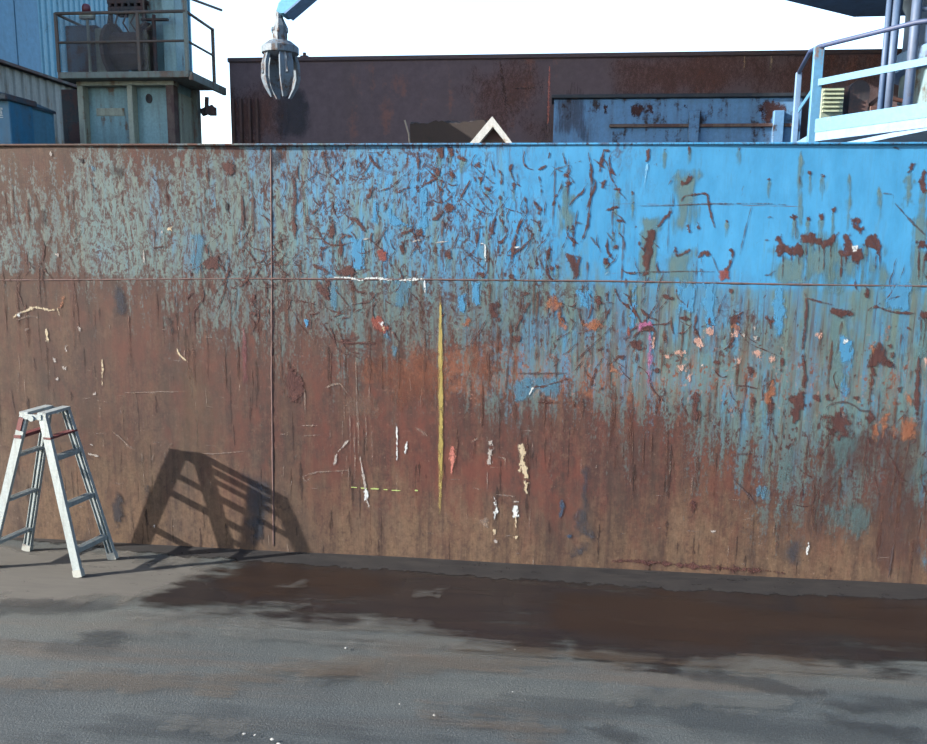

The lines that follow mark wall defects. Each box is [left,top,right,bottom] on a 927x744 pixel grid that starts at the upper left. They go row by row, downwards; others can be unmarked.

rust [241,177,254,236]
rust [291,175,310,239]
rust [312,219,363,309]
rust [432,203,454,236]
rust [533,160,589,279]
rust [773,207,888,298]
rust [904,163,927,290]
rust [341,298,398,383]
rust [463,217,604,421]
rust [590,171,749,468]
rust [736,307,856,474]
peeling [518,444,528,494]